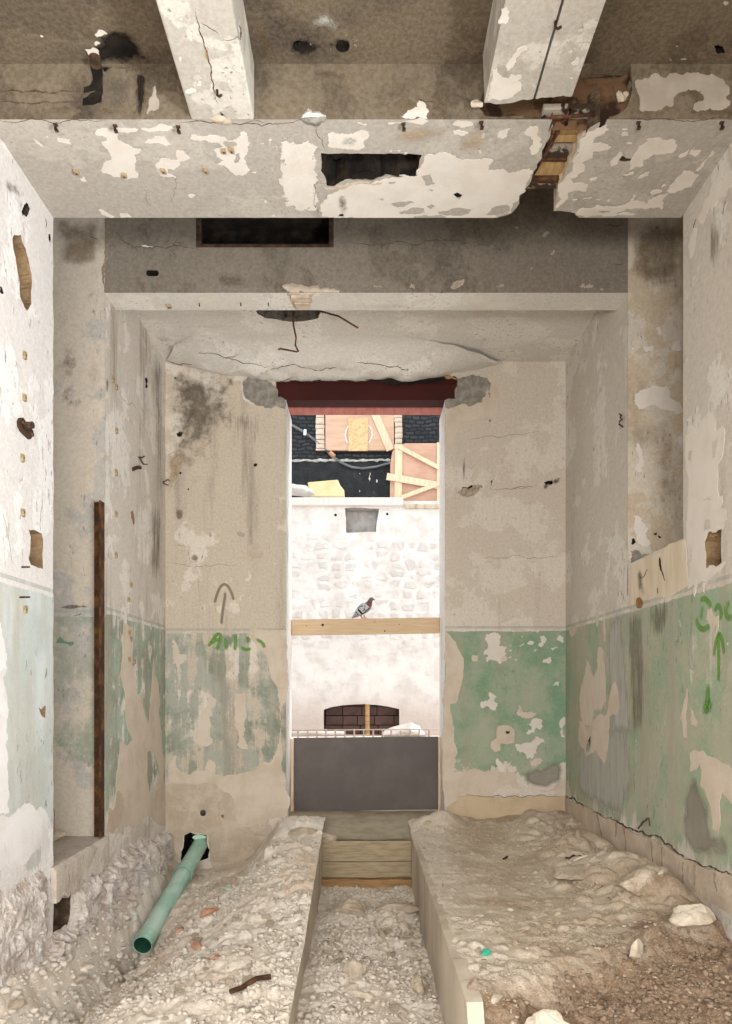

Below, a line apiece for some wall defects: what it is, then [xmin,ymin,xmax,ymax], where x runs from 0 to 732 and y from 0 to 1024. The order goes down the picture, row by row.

crack [182,17,324,147]
peeling [95,124,191,180]
peeling [190,45,731,218]
peeling [688,169,732,259]
spalling [230,283,358,353]
water stain [180,379,223,442]
peeling [634,385,683,414]
peeling [677,414,727,597]
spalling [0,615,290,988]
spalling [442,608,732,915]
crack [473,794,730,892]